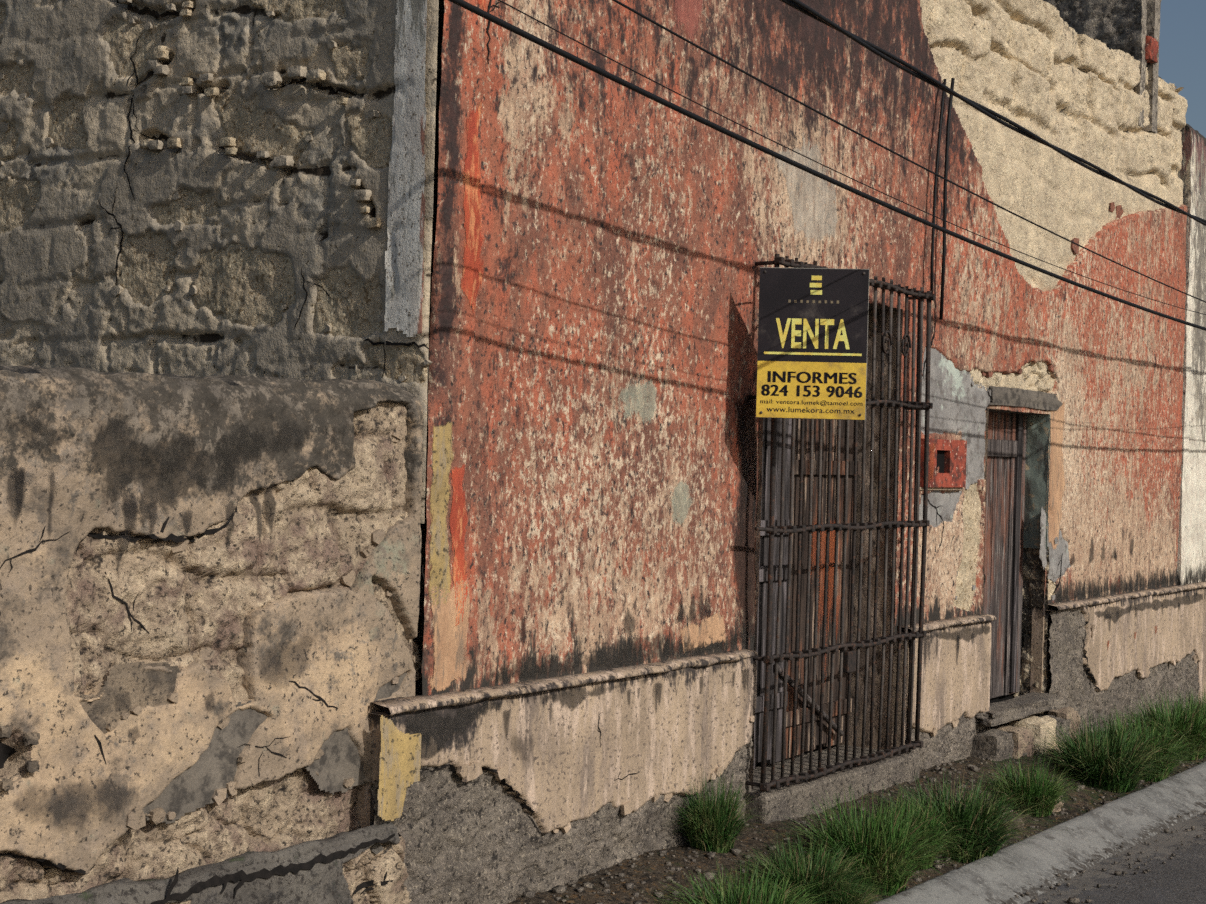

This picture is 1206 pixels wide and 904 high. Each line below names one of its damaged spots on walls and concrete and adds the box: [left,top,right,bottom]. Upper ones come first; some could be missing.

crack [99,36,154,296]
spalling [920,0,1188,291]
spalling [970,361,1054,397]
crack [0,492,248,571]
crack [105,572,149,633]
damp [91,420,307,520]
spalling [0,402,756,904]
damp [406,702,501,758]
damp [548,686,612,708]
damp [492,394,758,681]
peeling [1046,402,1065,557]
spalling [1043,579,1200,735]